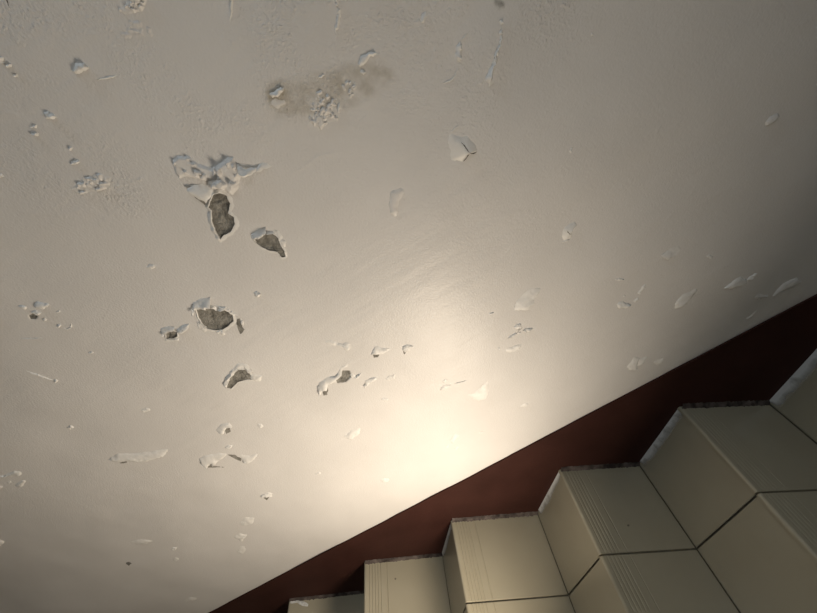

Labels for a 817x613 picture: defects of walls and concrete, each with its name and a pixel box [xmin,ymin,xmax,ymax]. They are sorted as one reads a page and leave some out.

flaking render [173,155,272,243]
flaking render [251,227,287,260]
flaking render [161,298,245,341]
flaking render [223,363,262,390]
peeling [317,364,361,395]
peeling [199,445,258,469]